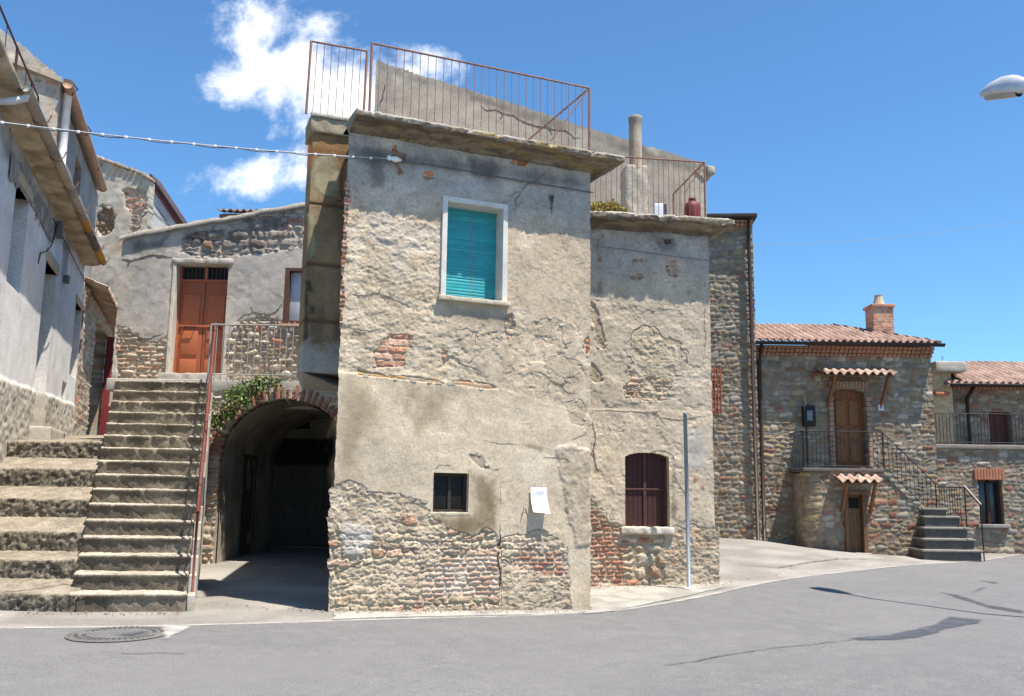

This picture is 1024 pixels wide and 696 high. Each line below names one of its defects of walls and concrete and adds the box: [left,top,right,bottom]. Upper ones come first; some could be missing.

crack [480,105,575,138]
flaking render [97,156,155,232]
flaking render [181,212,316,259]
flaking render [312,156,350,329]
flaking render [116,327,168,379]
flaking render [357,333,495,390]
crack [448,327,481,372]
flaking render [623,326,688,403]
flaking render [326,480,572,611]
crack [475,508,528,590]
flaking render [590,500,721,586]